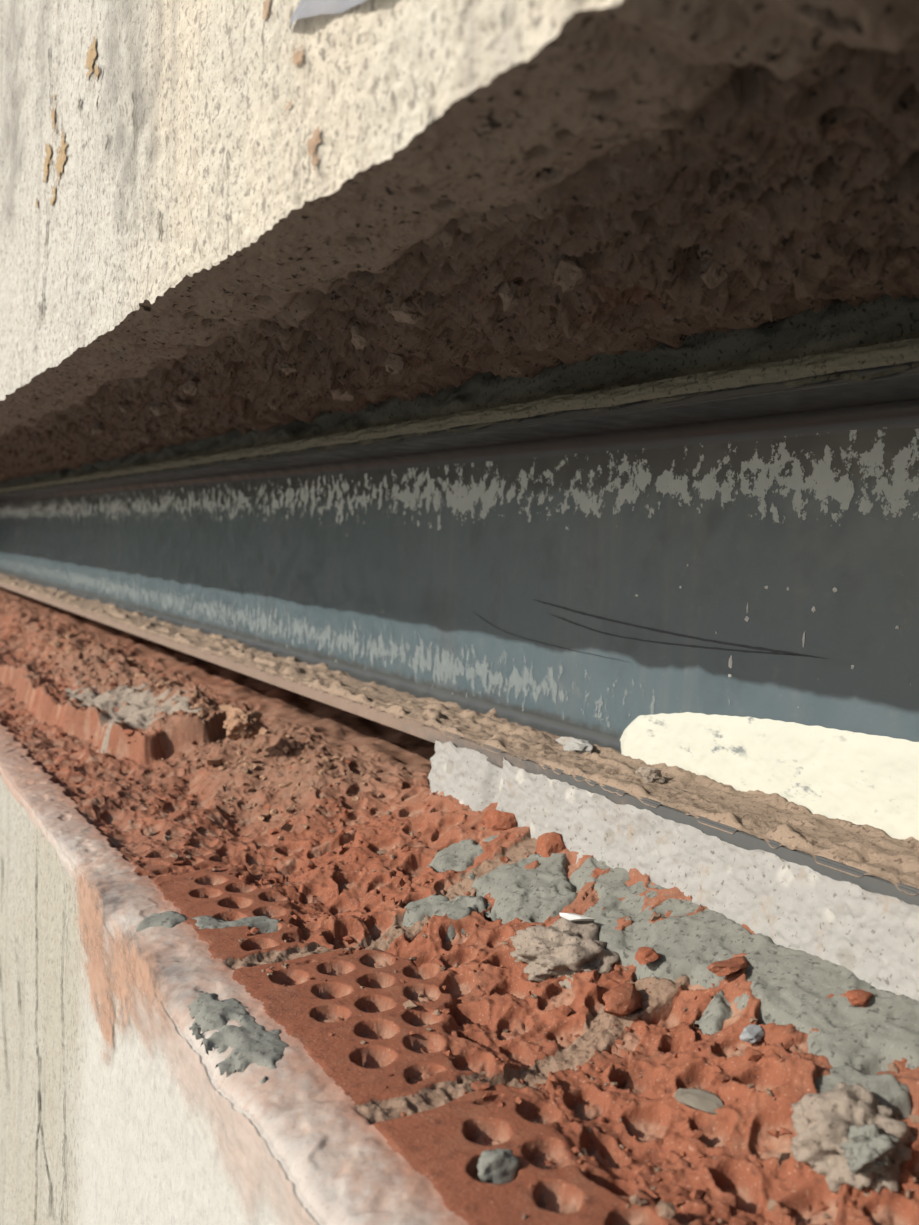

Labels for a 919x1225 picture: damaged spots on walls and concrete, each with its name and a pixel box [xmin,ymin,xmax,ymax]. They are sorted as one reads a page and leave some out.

peeling [1,427,919,536]
peeling [0,558,656,727]
spalling [481,809,518,831]
spalling [536,832,565,857]
peeling [559,913,595,921]
spalling [635,946,663,965]
spalling [707,956,747,977]
spalling [845,989,874,1007]
spalling [740,1024,764,1043]
spalling [675,1088,724,1115]